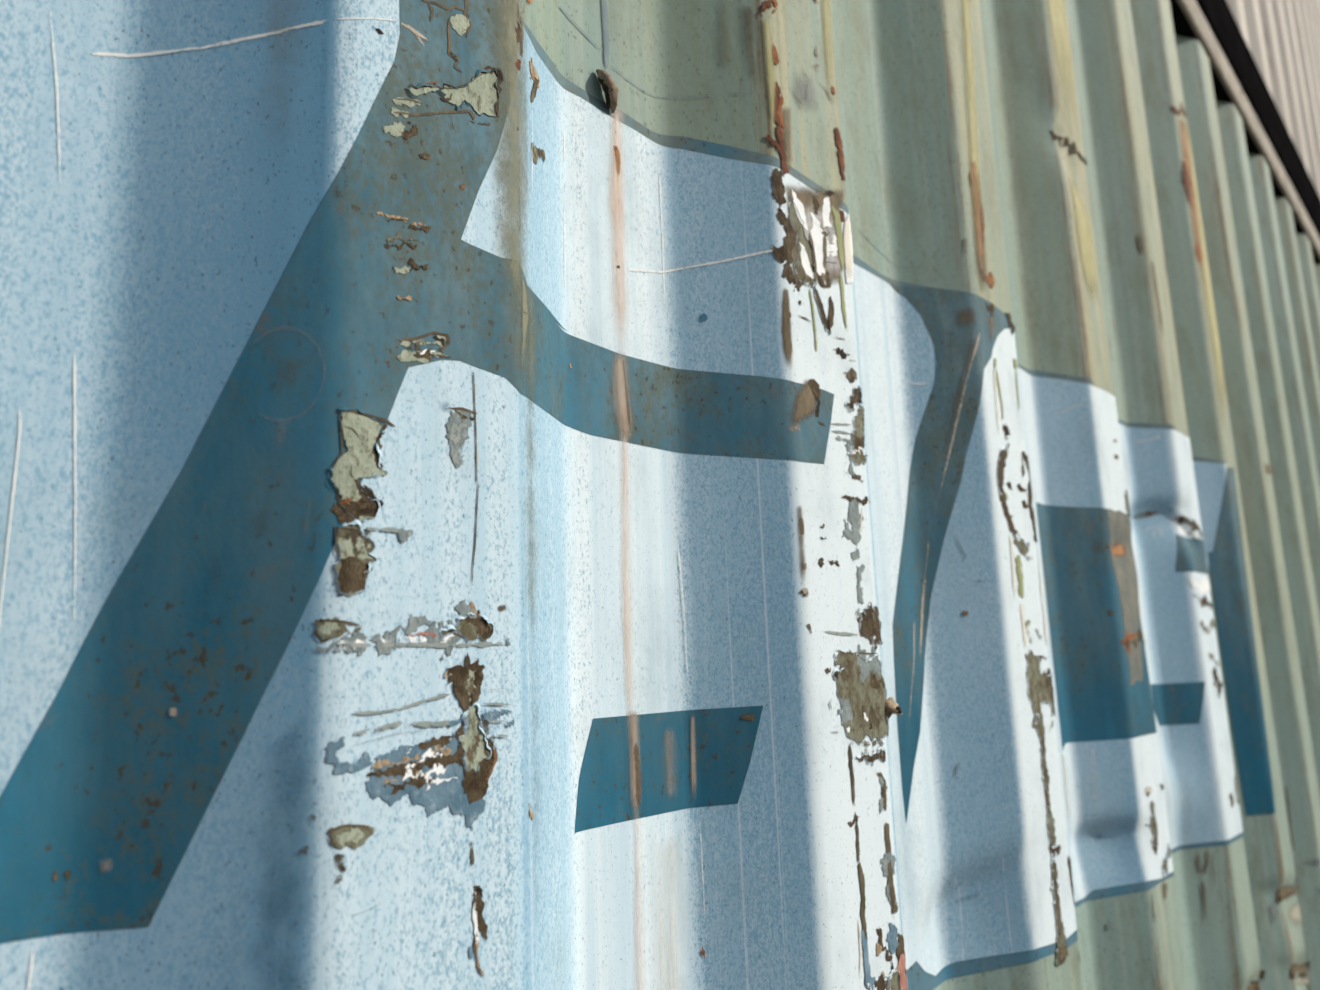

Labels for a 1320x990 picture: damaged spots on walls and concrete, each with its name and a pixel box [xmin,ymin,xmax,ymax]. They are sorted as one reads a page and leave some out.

peeling [383,2,540,140]
rust [614,113,624,318]
rust [759,0,791,174]
rust [961,0,995,289]
peeling [327,407,413,597]
rust [616,357,630,505]
peeling [771,166,889,766]
peeling [997,425,1055,724]
peeling [314,600,515,831]
rust [631,713,642,807]